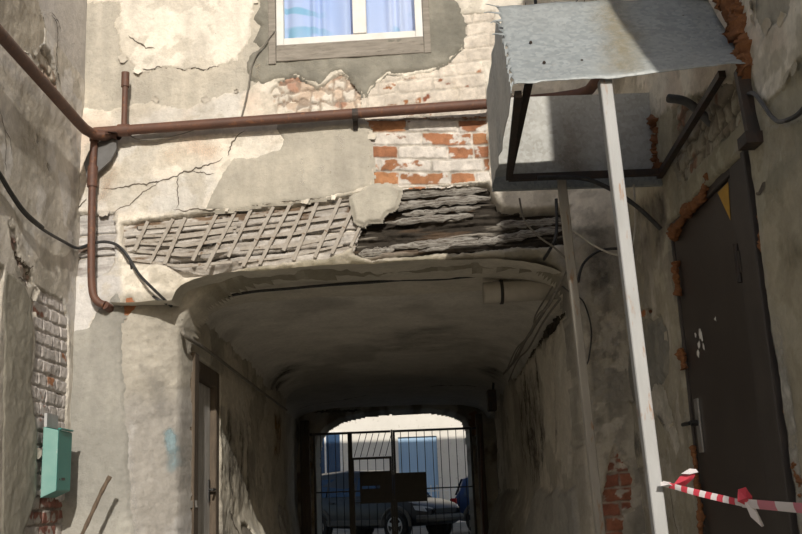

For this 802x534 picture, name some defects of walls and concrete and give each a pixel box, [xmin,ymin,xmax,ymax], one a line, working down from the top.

peeling [0,0,58,89]
crack [128,35,219,71]
flaking render [271,13,495,114]
peeling [749,0,790,35]
peeling [761,57,802,126]
crack [104,131,244,212]
flaking render [349,109,490,229]
flaking render [8,216,67,534]
leakage [228,416,249,501]
flaking render [602,447,649,534]